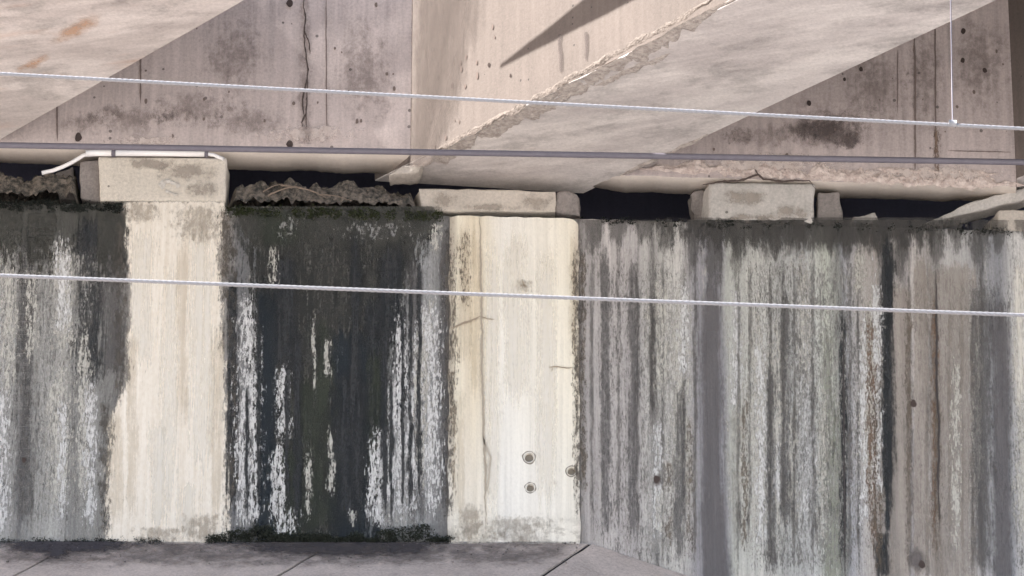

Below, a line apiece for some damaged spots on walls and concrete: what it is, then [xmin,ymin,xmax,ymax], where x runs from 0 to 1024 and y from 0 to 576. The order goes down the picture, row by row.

crack [301,0,310,139]
spalling [389,0,729,186]
water stain [0,159,472,544]
water stain [571,241,612,525]
water stain [628,236,913,576]
water stain [929,255,1024,576]